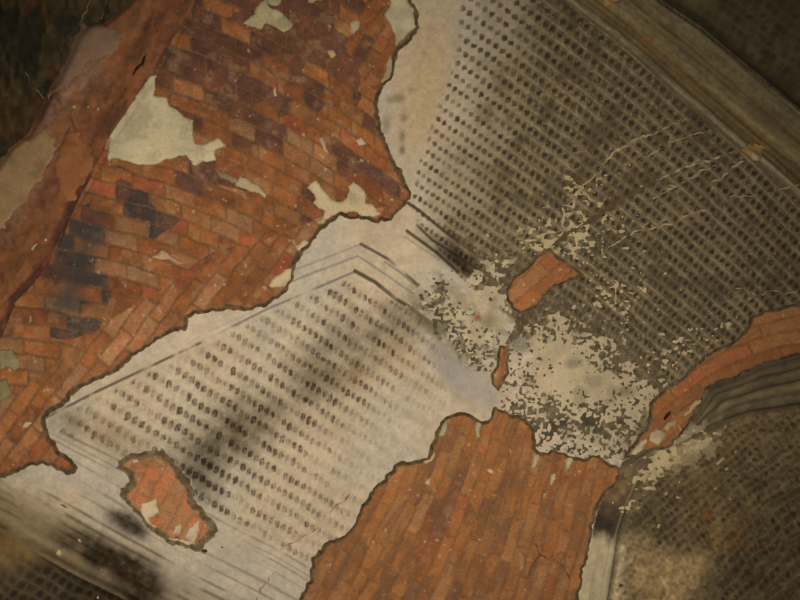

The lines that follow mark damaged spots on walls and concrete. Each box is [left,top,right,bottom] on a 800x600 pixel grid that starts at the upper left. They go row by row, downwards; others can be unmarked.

spalling [0,0,420,478]
crack [549,118,800,249]
spalling [299,174,800,600]
damp [83,536,161,600]
damp [114,513,142,535]
spalling [116,448,218,554]